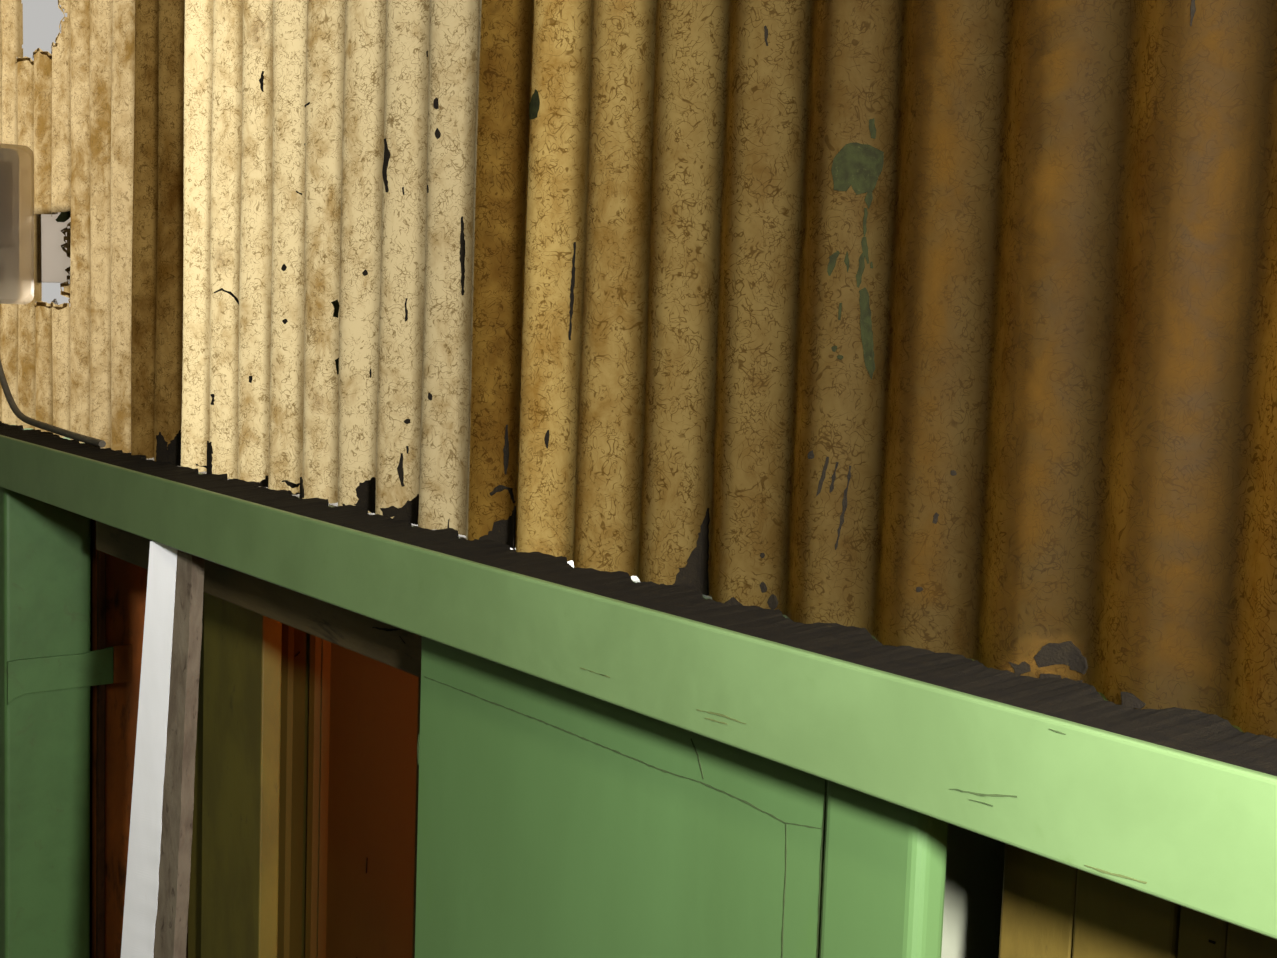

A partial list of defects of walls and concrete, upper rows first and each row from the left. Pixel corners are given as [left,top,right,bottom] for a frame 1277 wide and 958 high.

peeling [831,118,884,237]